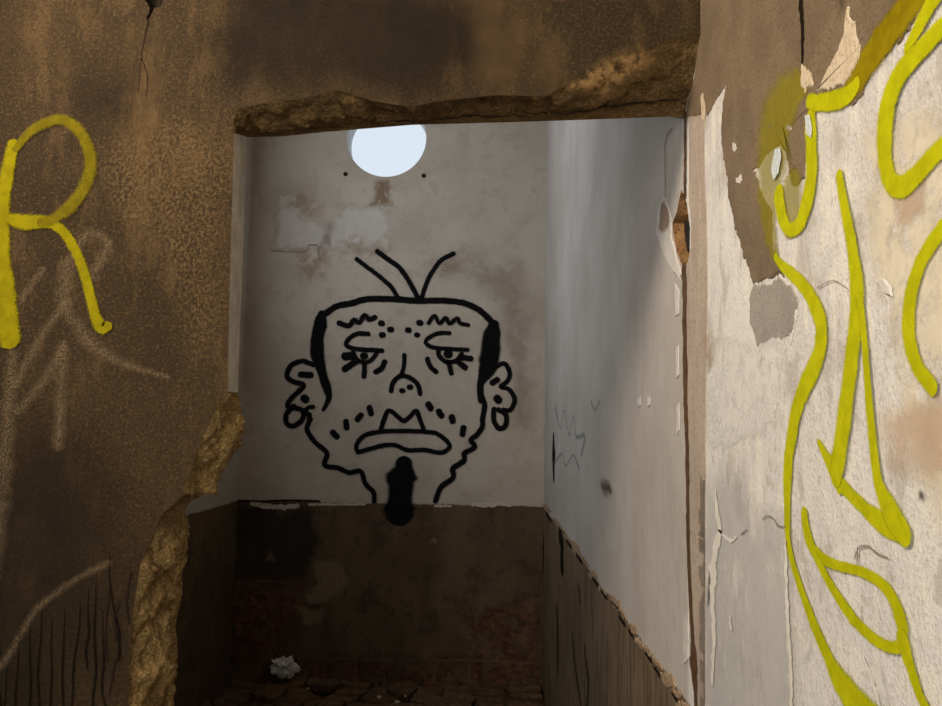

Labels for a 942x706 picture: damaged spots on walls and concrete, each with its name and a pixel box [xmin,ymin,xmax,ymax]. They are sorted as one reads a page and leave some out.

crack [138,21,149,97]
crack [797,0,805,64]
peeling [837,17,915,110]
peeling [234,0,898,346]
peeling [891,118,941,175]
peeling [870,160,942,379]
peeling [237,499,366,511]
peeling [471,499,512,508]
spalling [128,391,246,706]